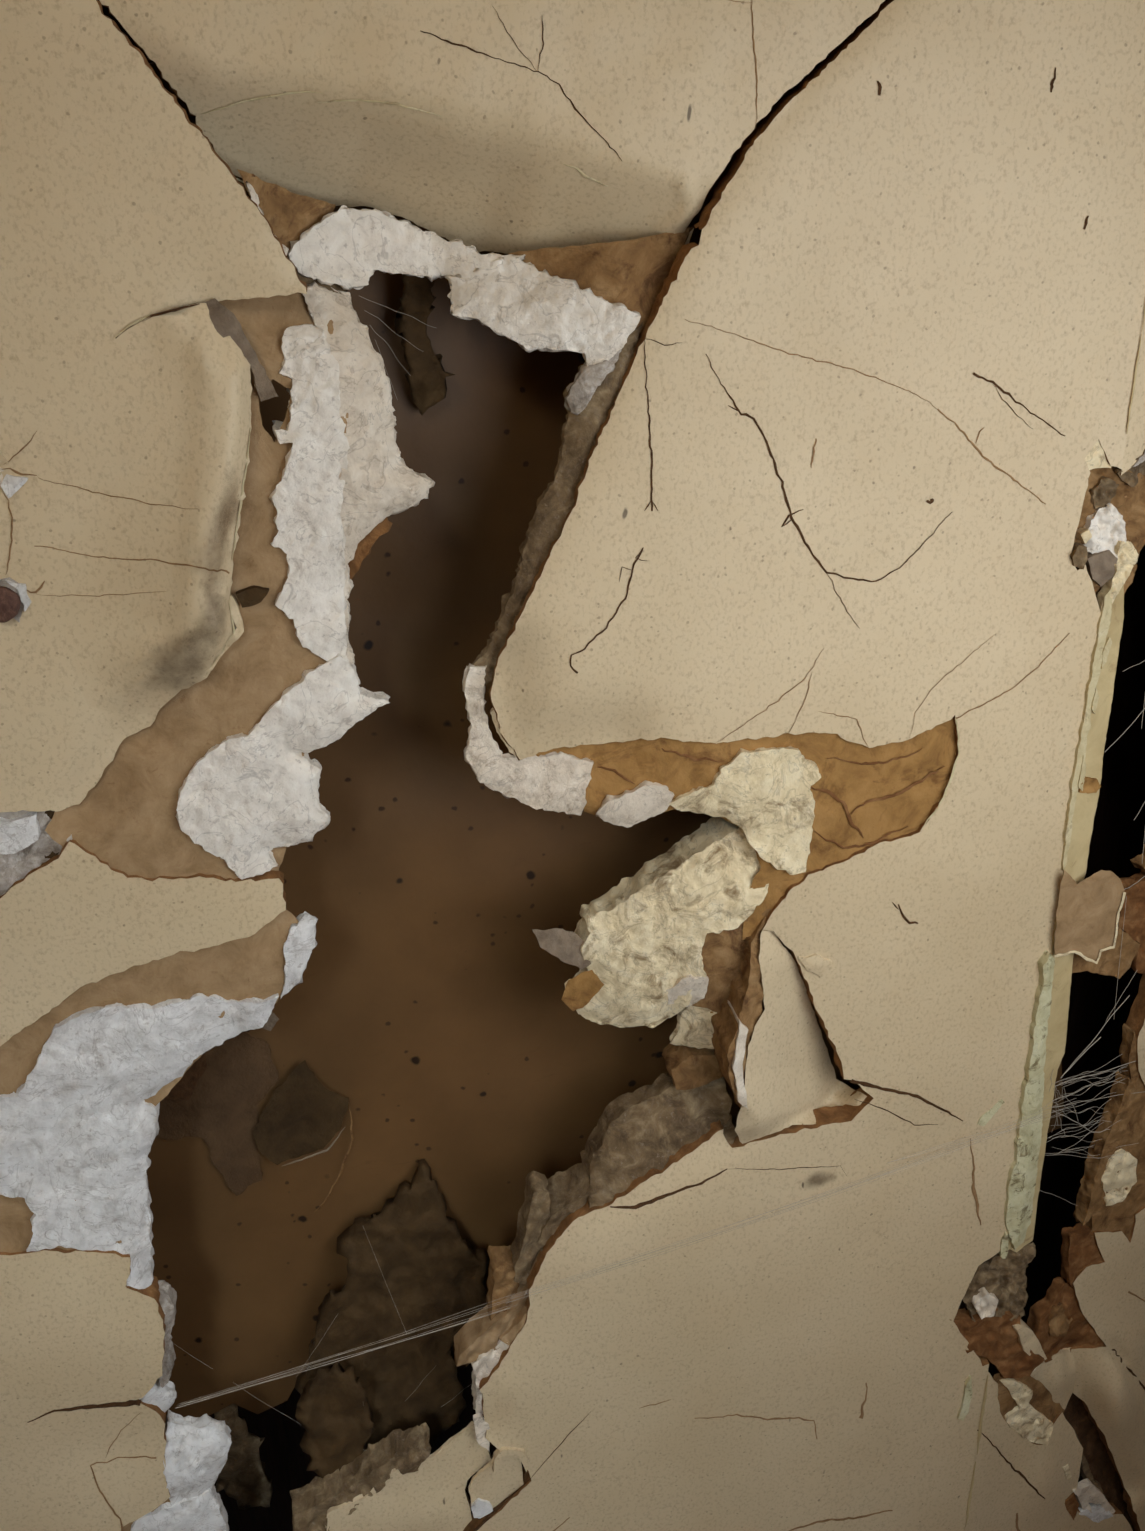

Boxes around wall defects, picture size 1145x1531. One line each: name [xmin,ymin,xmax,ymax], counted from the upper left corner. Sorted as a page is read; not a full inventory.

spalling [149,62,196,124]
crack [421,7,622,161]
crack [730,0,758,122]
spalling [742,43,842,143]
crack [644,319,1065,626]
crack [570,548,646,673]
crack [718,651,869,748]
crack [956,633,1070,719]
spalling [1061,440,1145,871]
spalling [0,150,960,1531]
spalling [957,1373,1064,1531]
peeling [1063,1464,1115,1523]